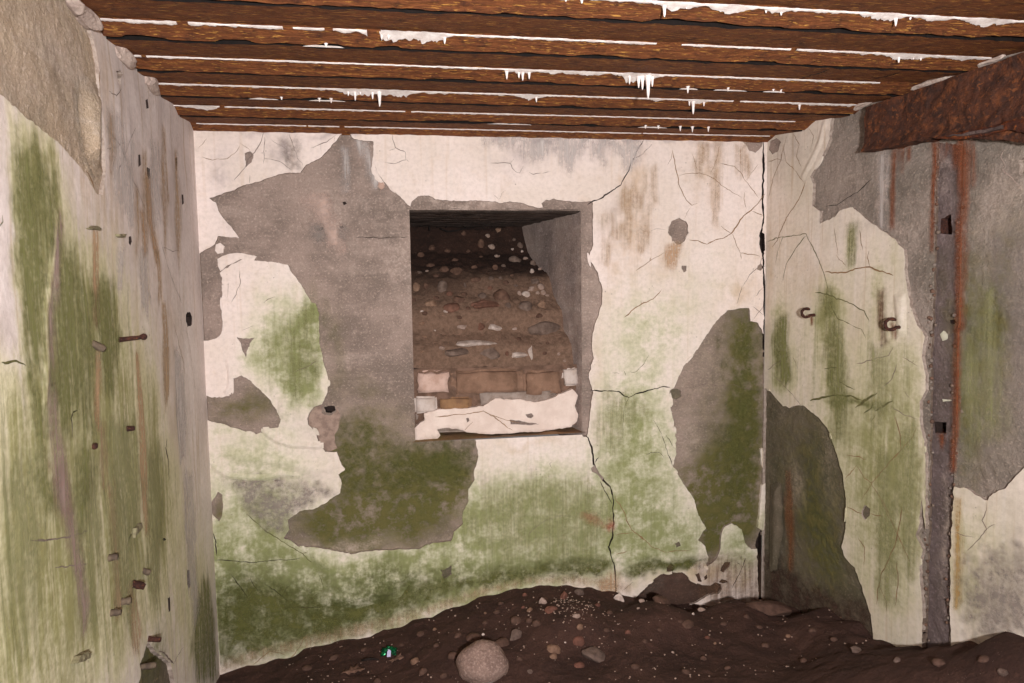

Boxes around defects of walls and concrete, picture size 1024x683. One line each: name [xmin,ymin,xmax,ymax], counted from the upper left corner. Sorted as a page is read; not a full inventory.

spalling [0,0,106,195]
efflorescence [100,18,657,48]
leakage [134,55,880,187]
efflorescence [580,0,1024,27]
efflorescence [681,44,992,63]
leakage [33,251,163,650]
spalling [186,134,603,554]
crack [583,116,917,610]
spalling [638,308,873,636]
rust [878,292,896,343]
spalling [810,101,1024,648]
rust [931,140,975,471]